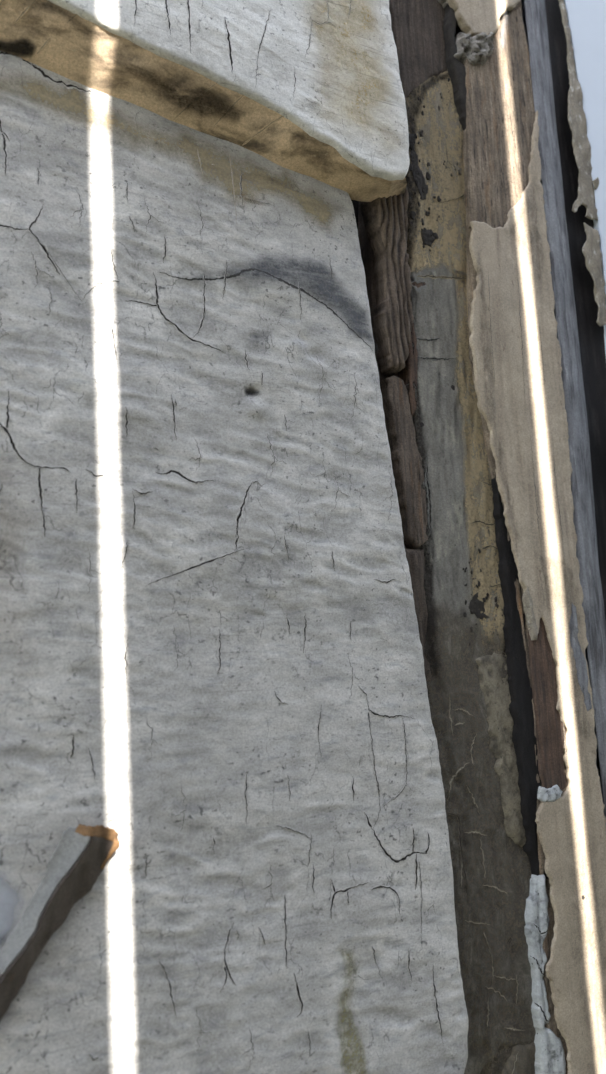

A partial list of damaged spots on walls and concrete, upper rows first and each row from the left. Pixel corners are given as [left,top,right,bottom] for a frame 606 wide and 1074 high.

crack [0,119,10,176]
crack [0,167,60,312]
crack [82,183,263,385]
crack [164,0,271,84]
peeling [464,7,535,228]
crack [0,389,106,537]
crack [87,396,216,593]
crack [234,415,287,554]
peeling [522,587,567,802]
peeling [569,603,592,711]
crack [276,621,444,1045]
crack [220,861,311,1057]